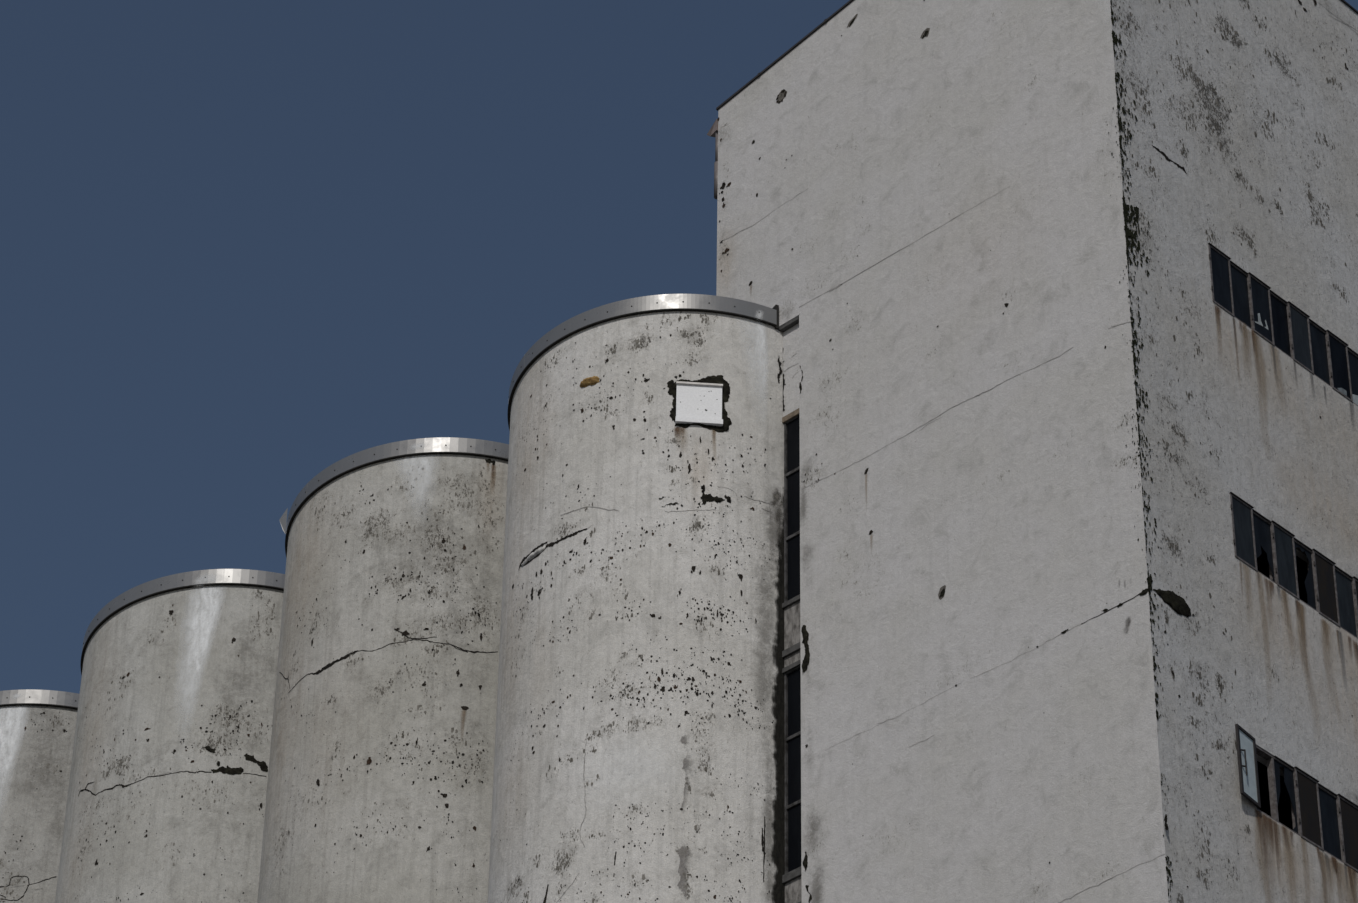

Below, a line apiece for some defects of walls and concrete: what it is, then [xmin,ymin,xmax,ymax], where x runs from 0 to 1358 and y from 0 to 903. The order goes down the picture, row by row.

spalling [540,332,650,422]
crack [519,506,619,568]
spalling [511,362,780,658]
crack [666,486,773,522]
spalling [356,528,497,645]
spalling [1149,573,1195,645]
crack [279,629,498,692]
crack [78,771,266,796]
spalling [173,700,269,793]
spalling [314,633,773,903]